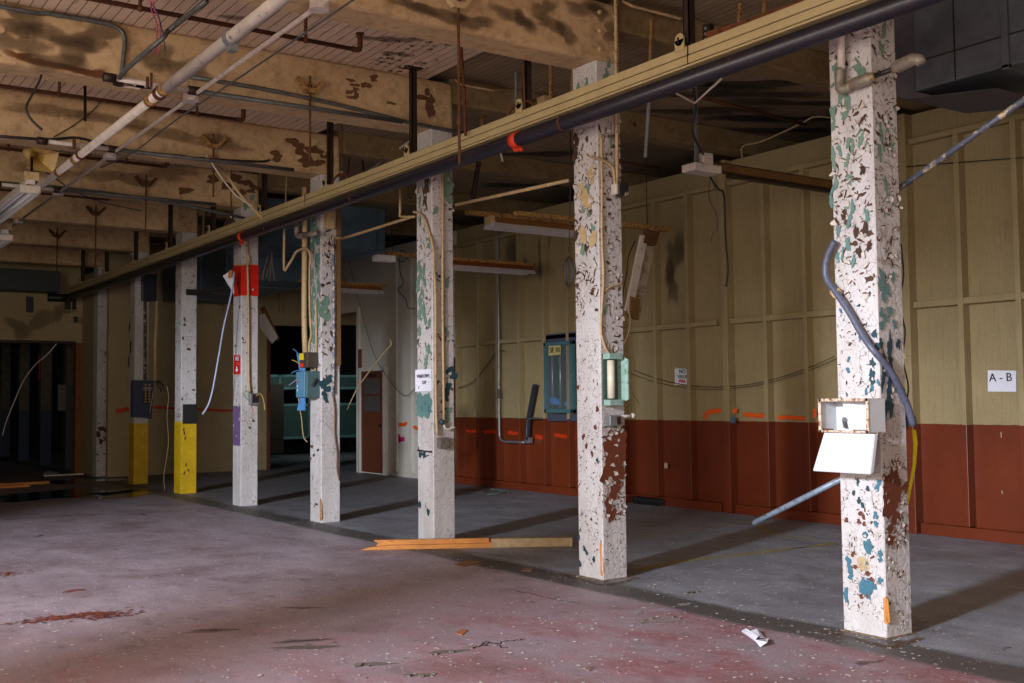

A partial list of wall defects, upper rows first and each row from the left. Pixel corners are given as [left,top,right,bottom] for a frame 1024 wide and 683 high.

peeling [270,138,327,168]
peeling [310,216,340,403]
peeling [345,41,451,100]
peeling [415,171,458,424]
peeling [572,119,637,567]
peeling [829,19,906,444]
peeling [841,457,912,627]